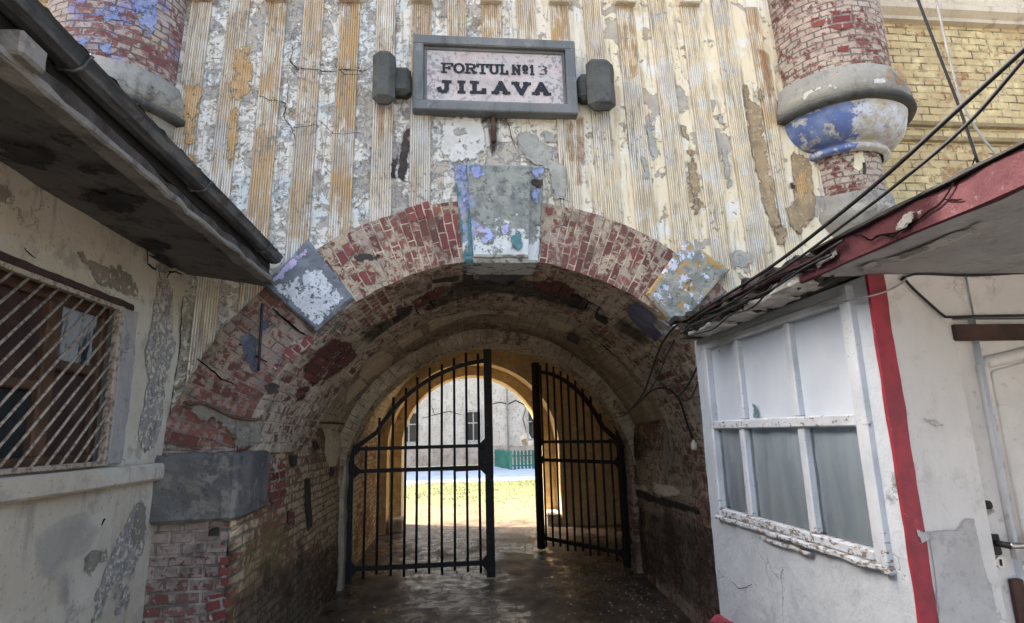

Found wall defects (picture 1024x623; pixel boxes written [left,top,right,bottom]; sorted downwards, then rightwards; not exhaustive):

peeling [183,85,203,162]
peeling [226,46,253,168]
crack [257,46,370,140]
flaking render [332,242,380,285]
flaking render [396,164,523,321]
peeling [531,168,561,215]
spalling [641,124,659,179]
spalling [681,125,701,215]
spalling [743,84,816,245]
peeling [136,240,176,453]
crack [147,251,233,412]
peeling [84,501,147,623]